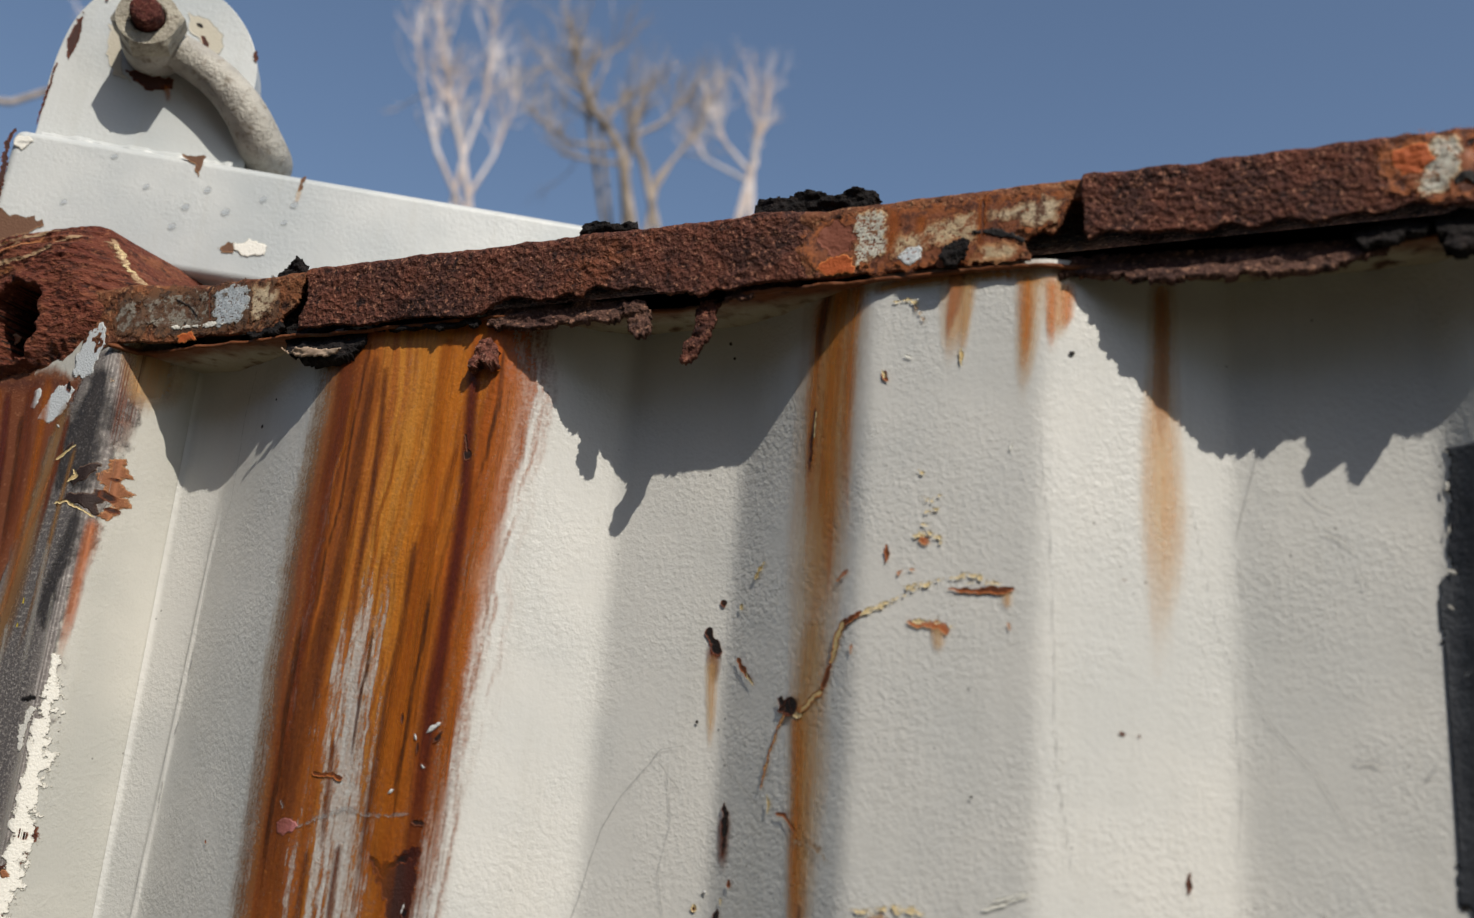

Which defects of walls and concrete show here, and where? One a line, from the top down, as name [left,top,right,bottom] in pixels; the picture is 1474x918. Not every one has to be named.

rust [105,239,147,285]
peeling [33,275,282,427]
peeling [220,239,267,257]
rust [278,256,310,277]
rust [579,220,639,236]
rust [754,186,882,213]
rust [881,207,1474,548]
peeling [0,653,66,918]
rust [0,368,83,643]
rust [233,299,653,918]
rust [792,289,860,918]
crack [760,594,906,814]